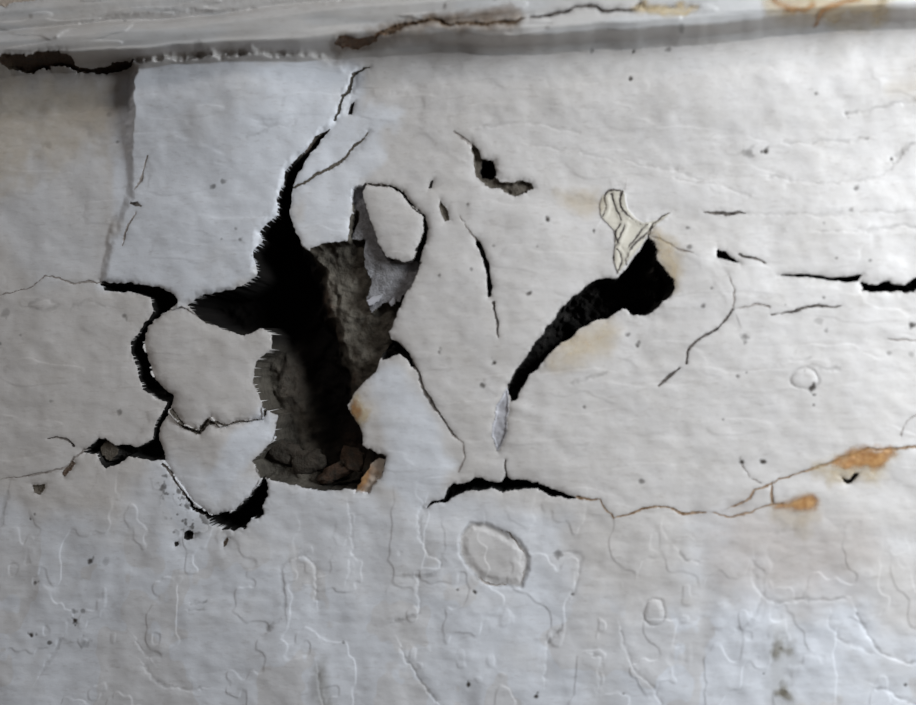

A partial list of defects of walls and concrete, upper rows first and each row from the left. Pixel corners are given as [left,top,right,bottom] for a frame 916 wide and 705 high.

crack [0,50,134,75]
crack [334,0,698,121]
flaking render [84,129,465,547]
crack [459,216,499,338]
flaking render [491,188,696,451]
crack [658,276,842,387]
crack [781,273,916,293]
crack [427,415,916,519]
rust [775,495,817,510]
rust [834,448,893,469]